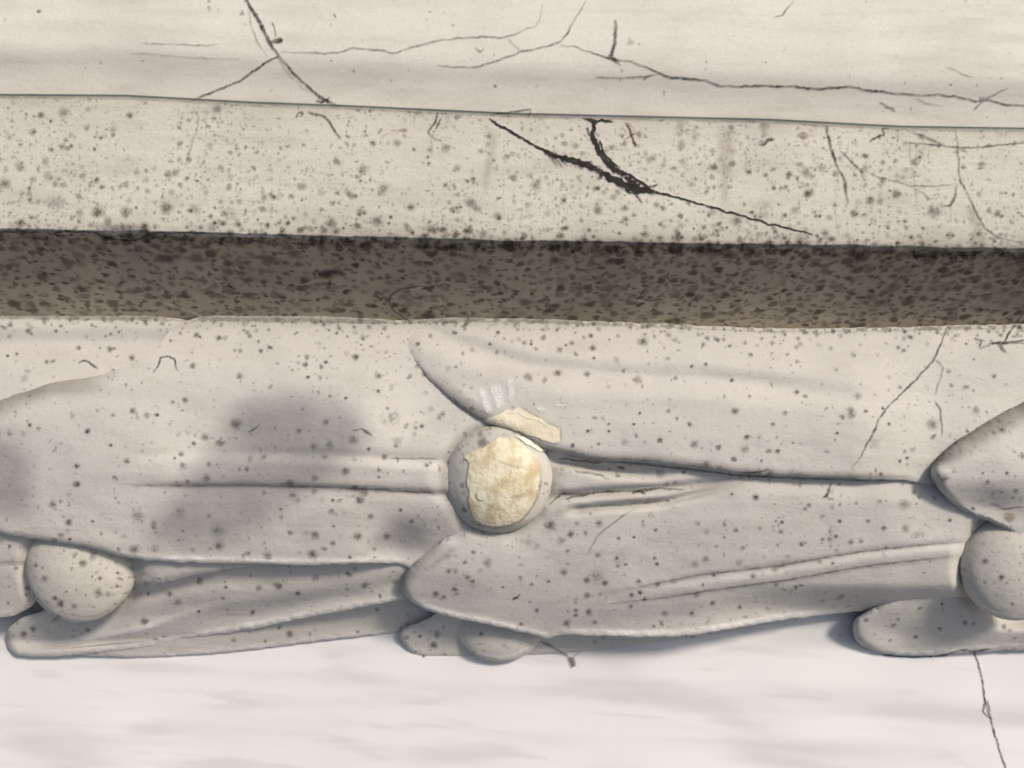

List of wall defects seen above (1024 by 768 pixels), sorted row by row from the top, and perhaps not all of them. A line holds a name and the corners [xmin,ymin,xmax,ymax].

crack [201,0,338,135]
crack [522,21,1017,140]
mould [143,207,801,255]
crack [489,109,812,235]
crack [826,130,864,192]
crack [928,138,1012,237]
crack [865,332,946,446]
crack [976,322,1023,349]
peeling [464,407,562,527]
crack [885,649,1006,767]